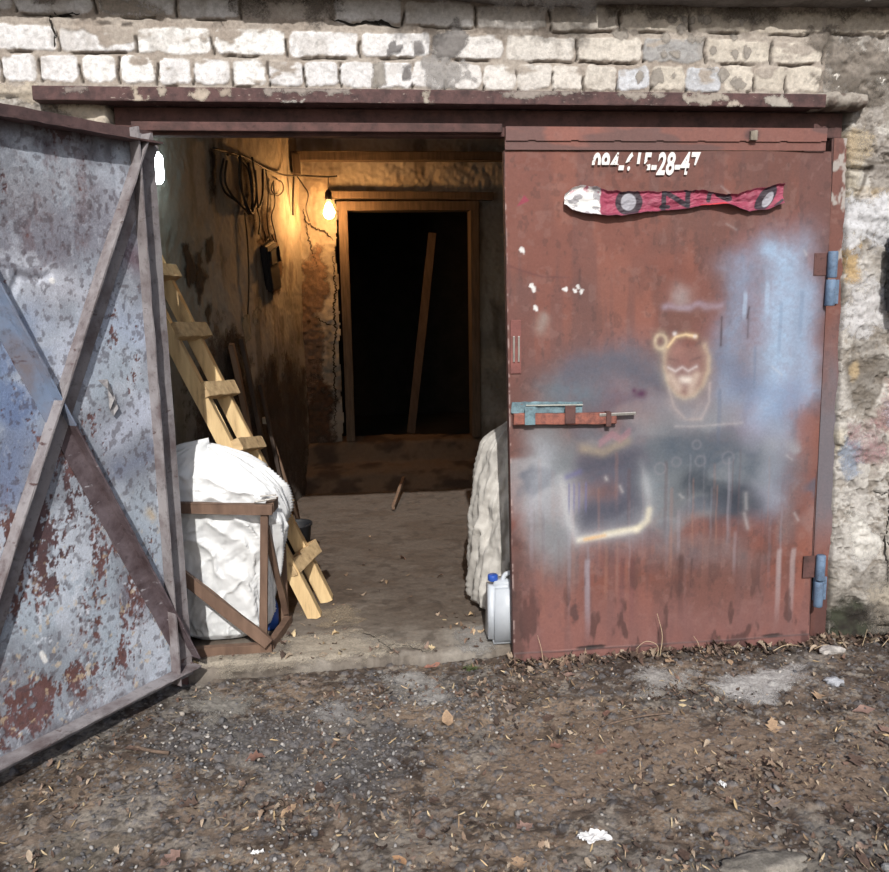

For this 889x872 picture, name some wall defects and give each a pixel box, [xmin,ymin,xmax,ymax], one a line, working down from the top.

crack [49,12,80,47]
peeling [131,86,167,101]
peeling [188,88,231,101]
peeling [263,88,350,102]
peeling [503,90,583,99]
peeling [618,92,665,101]
peeling [683,93,742,106]
peeling [764,94,792,107]
damp [181,236,309,498]
crack [874,490,889,587]